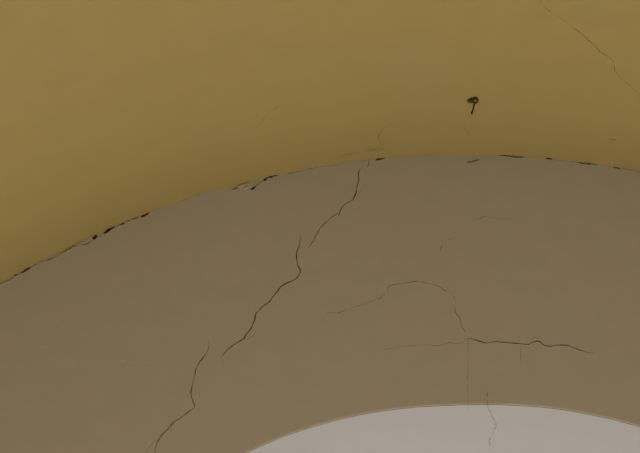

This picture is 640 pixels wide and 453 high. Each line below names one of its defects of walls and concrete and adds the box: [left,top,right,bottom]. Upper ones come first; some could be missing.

crack [146,161,370,453]
crack [321,281,594,412]